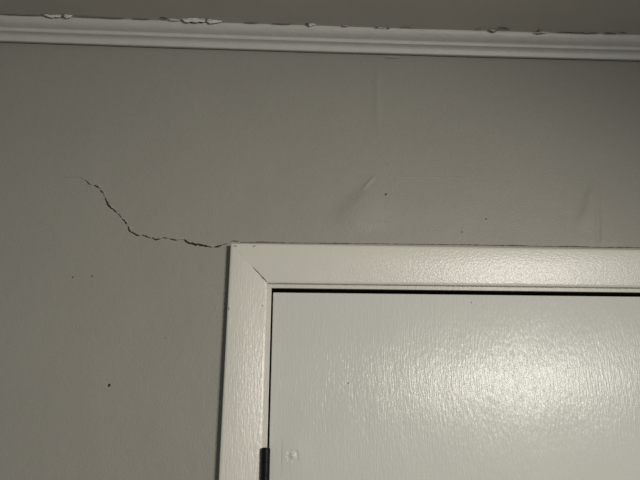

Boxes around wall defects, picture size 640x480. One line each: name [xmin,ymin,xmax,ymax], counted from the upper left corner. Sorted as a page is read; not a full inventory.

crack [68,177,285,282]
crack [321,239,384,247]
crack [416,241,525,249]
crack [543,243,640,251]